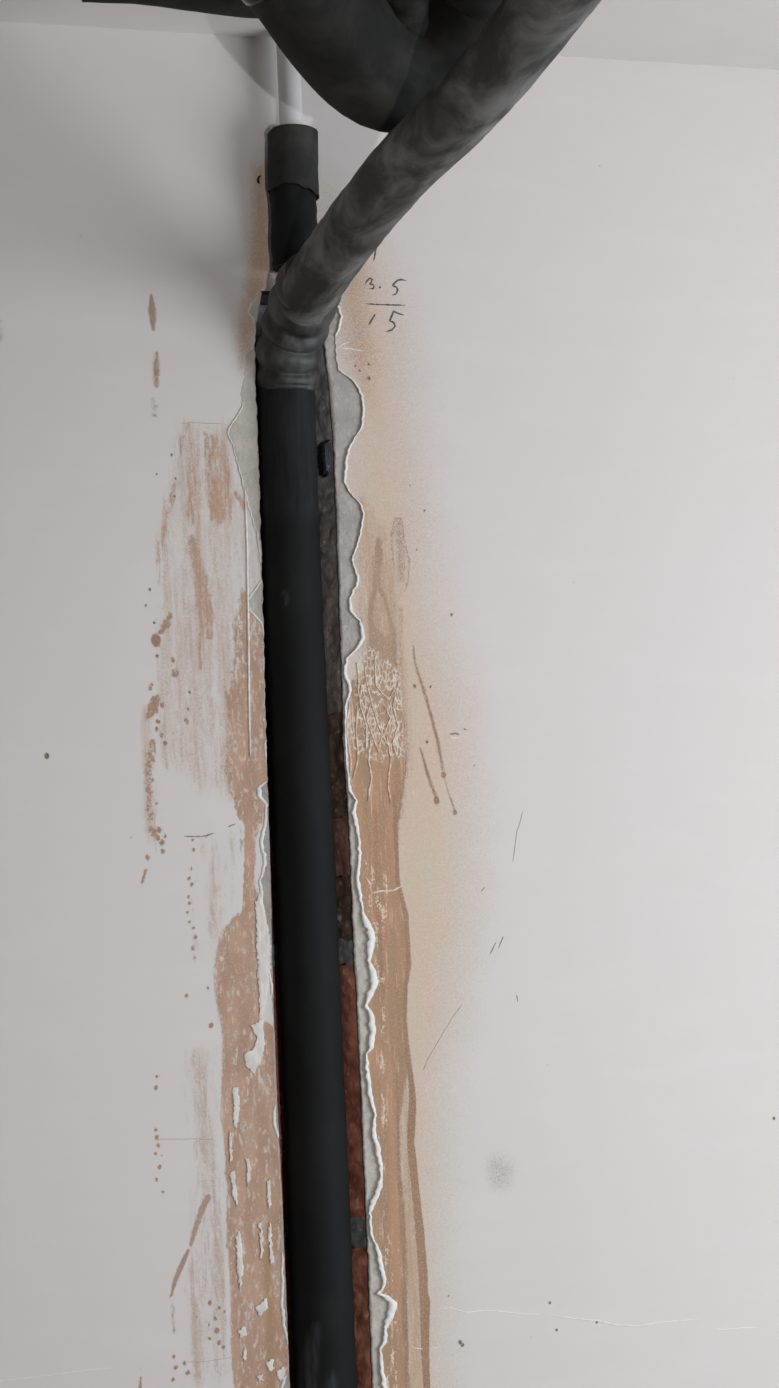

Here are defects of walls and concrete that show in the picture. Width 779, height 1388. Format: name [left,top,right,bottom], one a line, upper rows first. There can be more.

leakage [317,163,352,222]
spalling [227,293,264,637]
corrosion [151,611,179,678]
corrosion [140,682,168,883]
peeling [323,306,397,1388]
leakage [336,221,518,1388]
corrosion [169,1194,211,1333]